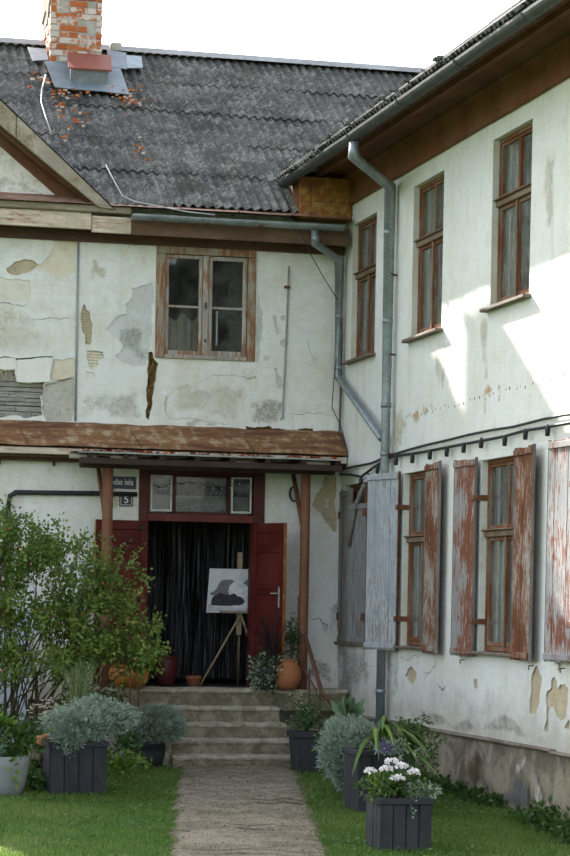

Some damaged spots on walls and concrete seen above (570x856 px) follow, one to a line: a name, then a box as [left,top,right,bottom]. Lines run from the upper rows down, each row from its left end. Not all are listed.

flaking render [6,240,77,279]
flaking render [0,305,104,422]
peeling [106,283,158,420]
flaking render [312,475,337,532]
flaking render [405,666,417,686]
flaking render [529,662,570,732]